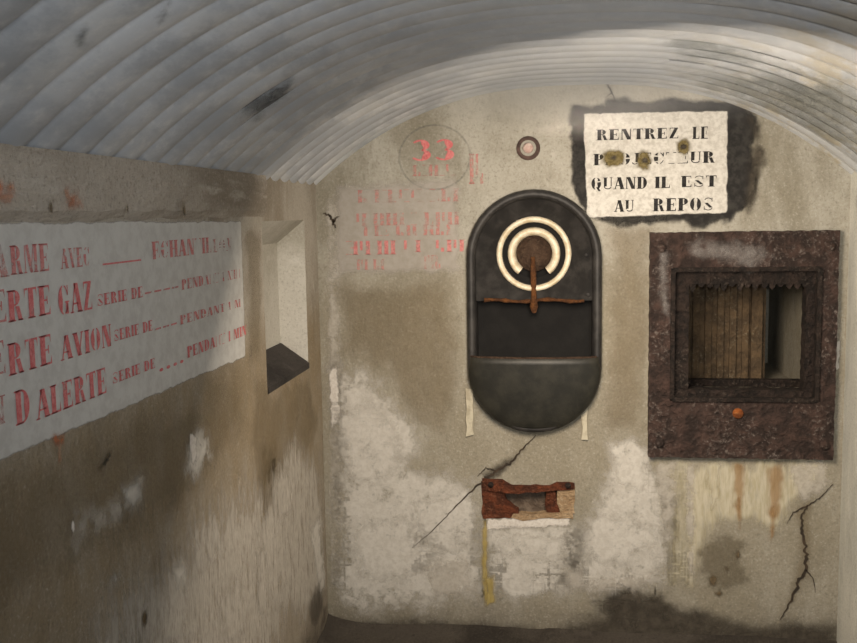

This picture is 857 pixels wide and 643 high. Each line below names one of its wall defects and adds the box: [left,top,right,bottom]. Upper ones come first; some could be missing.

water stain [721,81,857,140]
water stain [187,431,209,476]
water stain [99,442,325,643]
crack [412,435,536,548]
water stain [335,370,834,641]
crack [780,484,833,620]